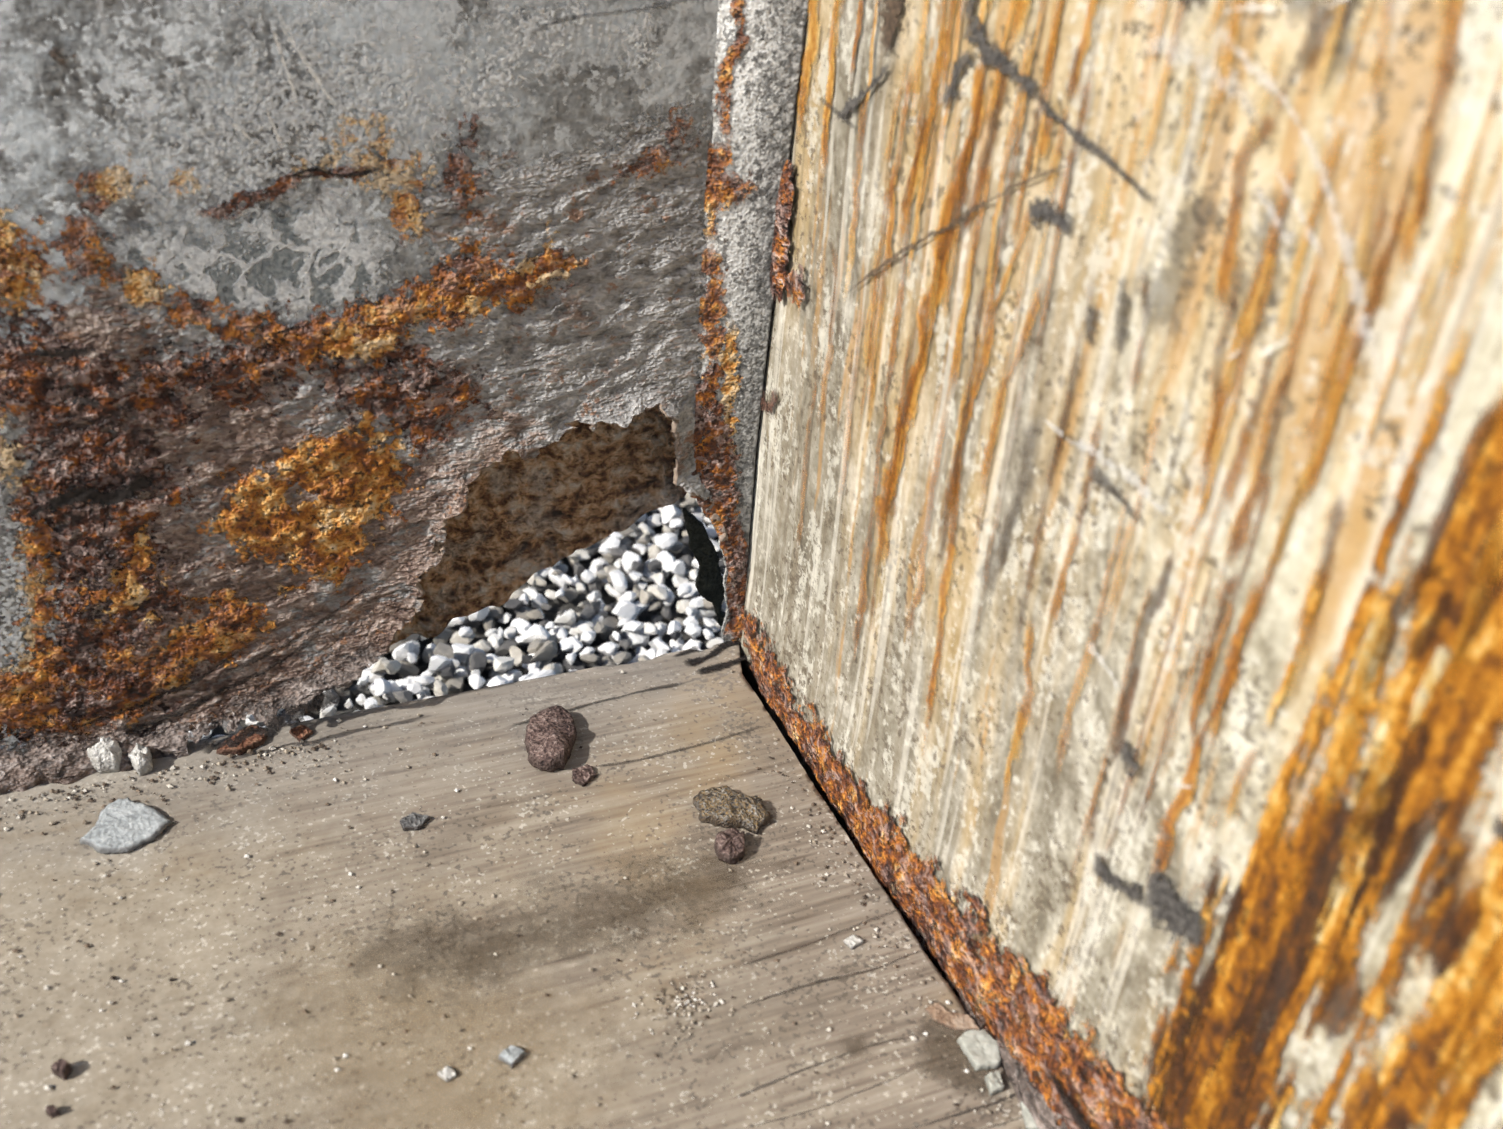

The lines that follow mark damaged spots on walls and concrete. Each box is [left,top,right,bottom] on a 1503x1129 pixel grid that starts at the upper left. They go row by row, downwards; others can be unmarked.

rust [0,113,594,751]
peeling [0,0,717,795]
peeling [400,812,430,831]
rust [524,705,597,787]
rust [607,0,1503,1129]